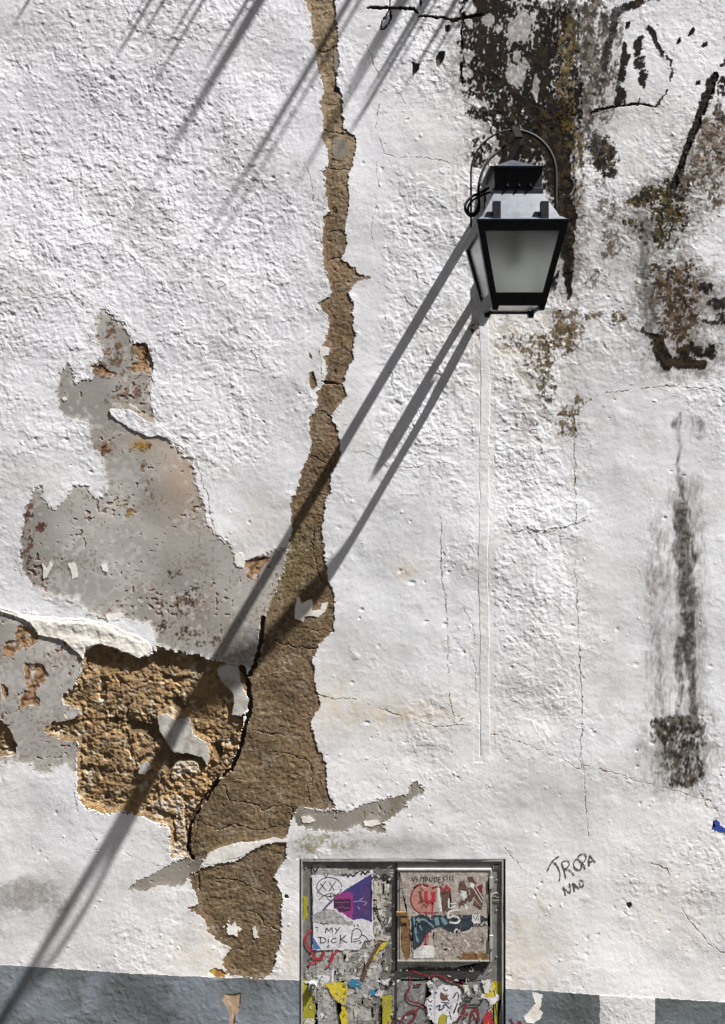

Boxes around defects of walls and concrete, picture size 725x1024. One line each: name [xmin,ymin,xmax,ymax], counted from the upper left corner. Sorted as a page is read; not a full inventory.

leakage [457,0,674,437]
leakage [641,256,725,372]
leakage [670,73,725,211]
peeling [0,0,425,980]
crack [186,615,266,859]
leakage [650,478,706,788]